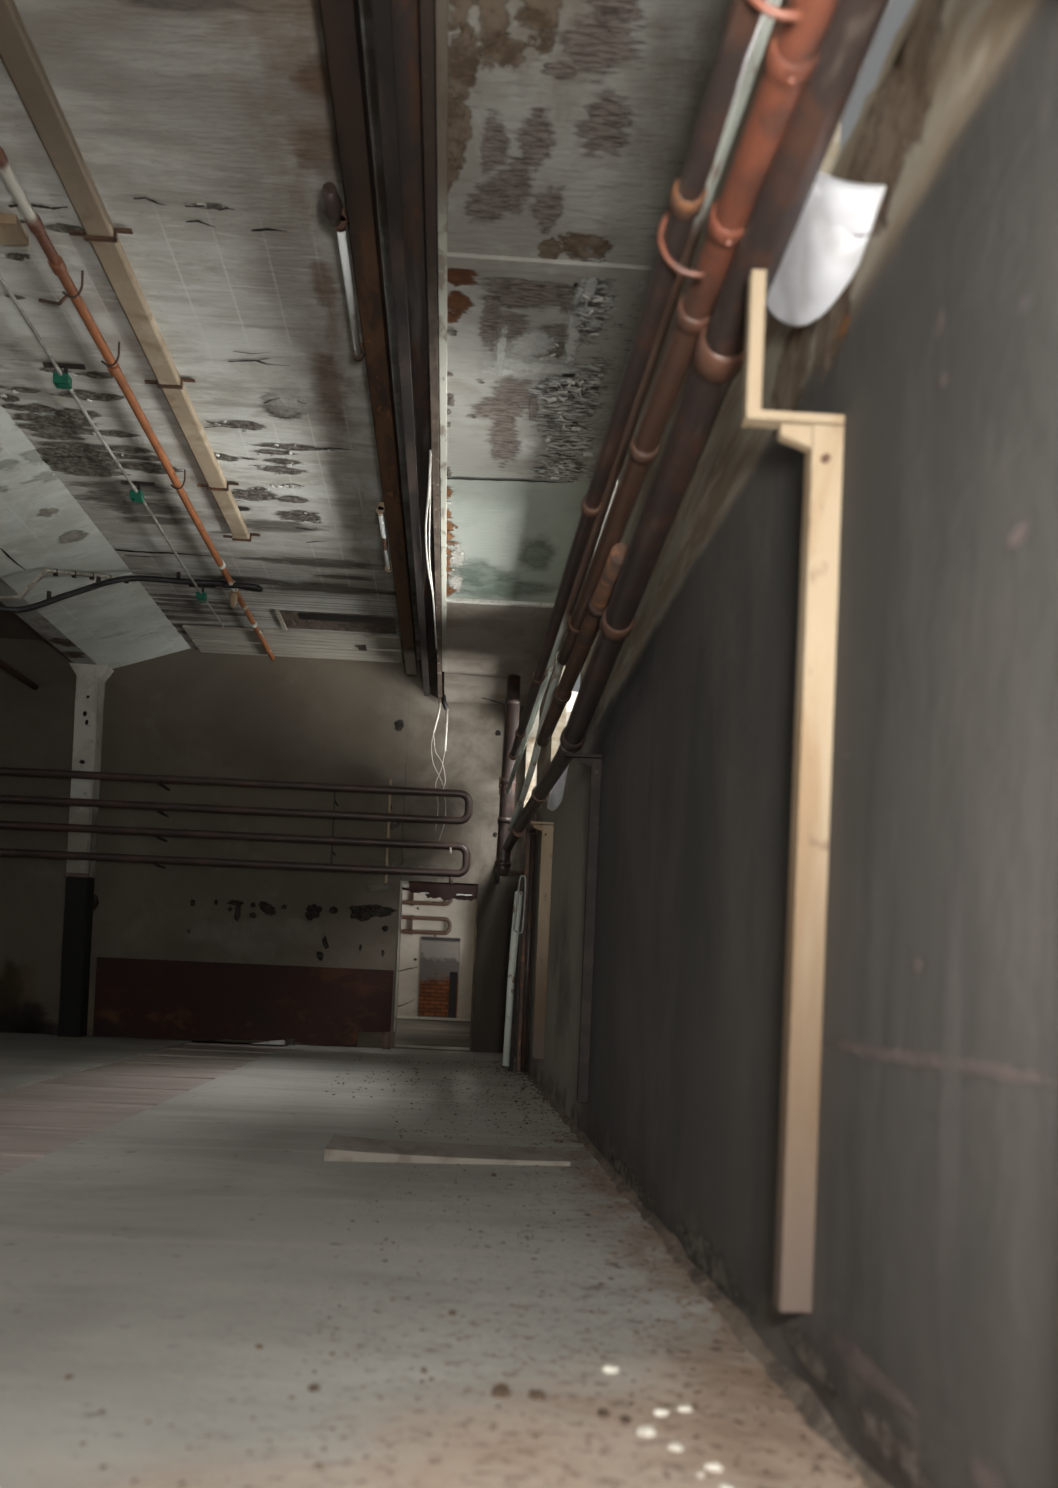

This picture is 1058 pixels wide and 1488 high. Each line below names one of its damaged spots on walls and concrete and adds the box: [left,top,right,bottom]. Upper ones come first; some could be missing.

peeling [529,232,617,482]
flaking render [447,372,455,427]
water stain [72,481,194,525]
flaking render [214,900,287,922]
flaking render [305,904,396,932]